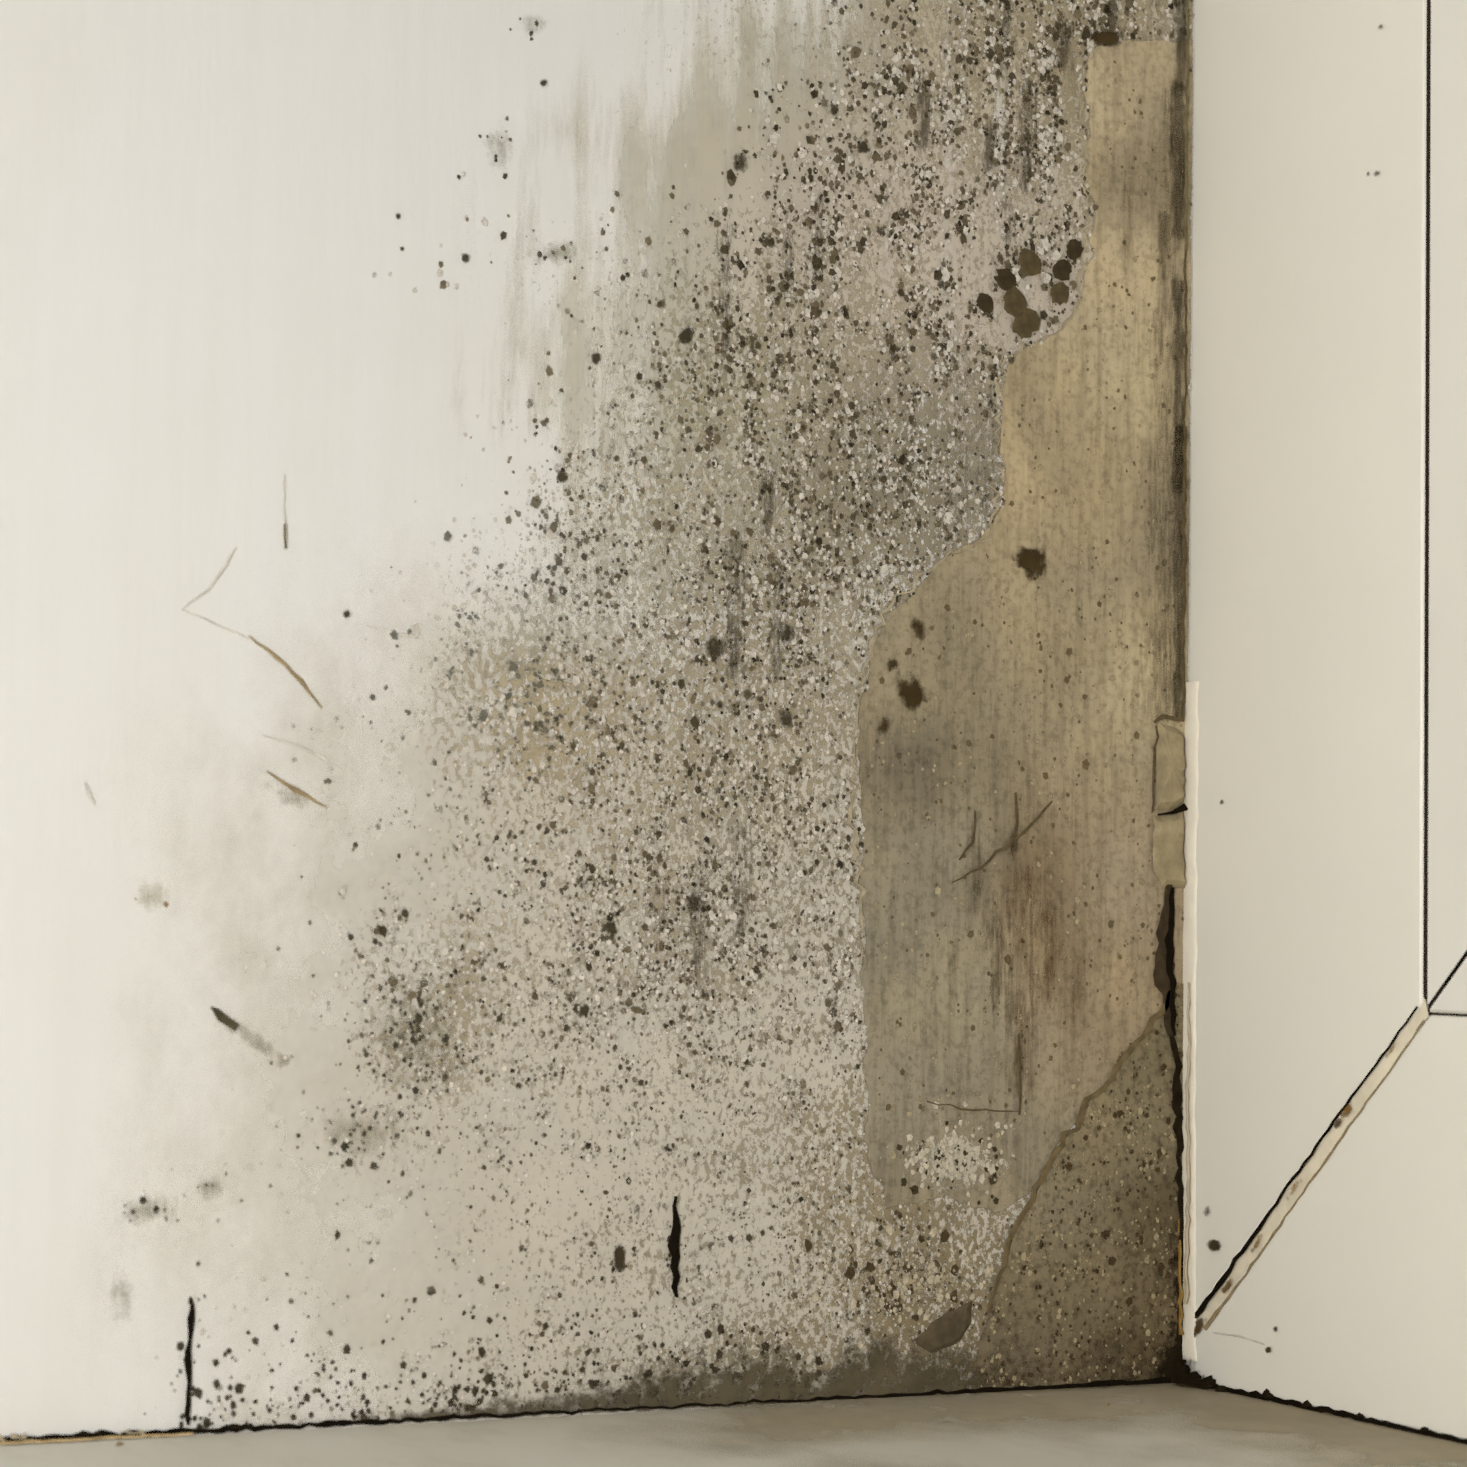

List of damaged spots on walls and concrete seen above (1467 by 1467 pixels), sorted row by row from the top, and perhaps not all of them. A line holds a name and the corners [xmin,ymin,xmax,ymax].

crack [1180,0,1190,719]
leakage [294,0,1467,1464]
peeling [846,39,1193,1395]
leakage [123,1197,178,1222]
leakage [170,1329,205,1392]
leakage [179,1375,280,1430]
crack [0,884,1265,1445]